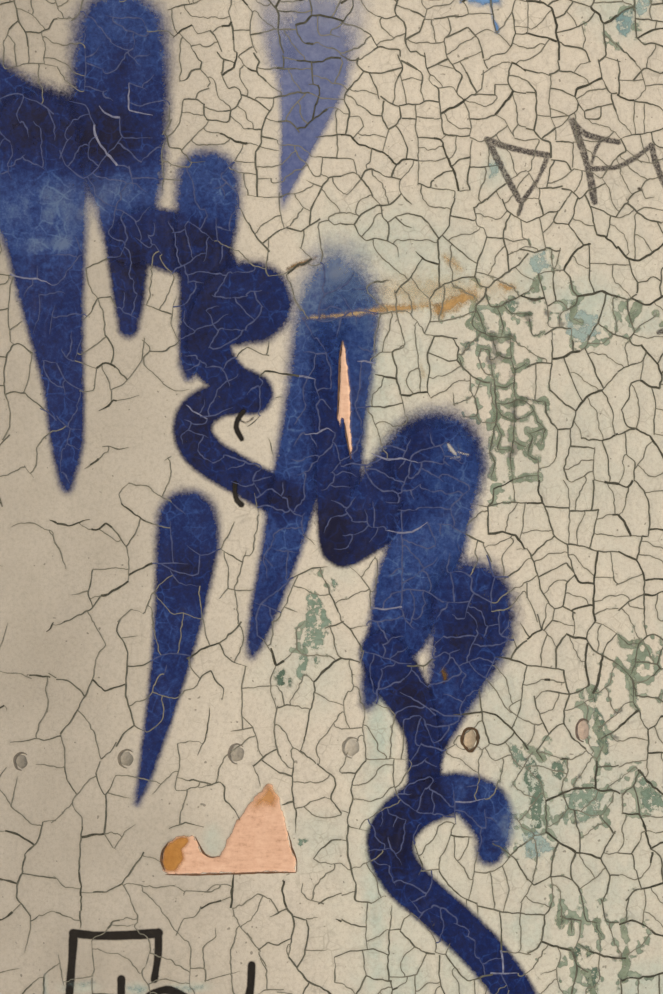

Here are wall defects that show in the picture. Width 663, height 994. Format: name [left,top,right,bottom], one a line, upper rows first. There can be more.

crack [0,0,663,683]
rust [339,293,473,316]
peeling [337,343,352,459]
crack [0,486,663,994]
peeling [160,784,307,876]